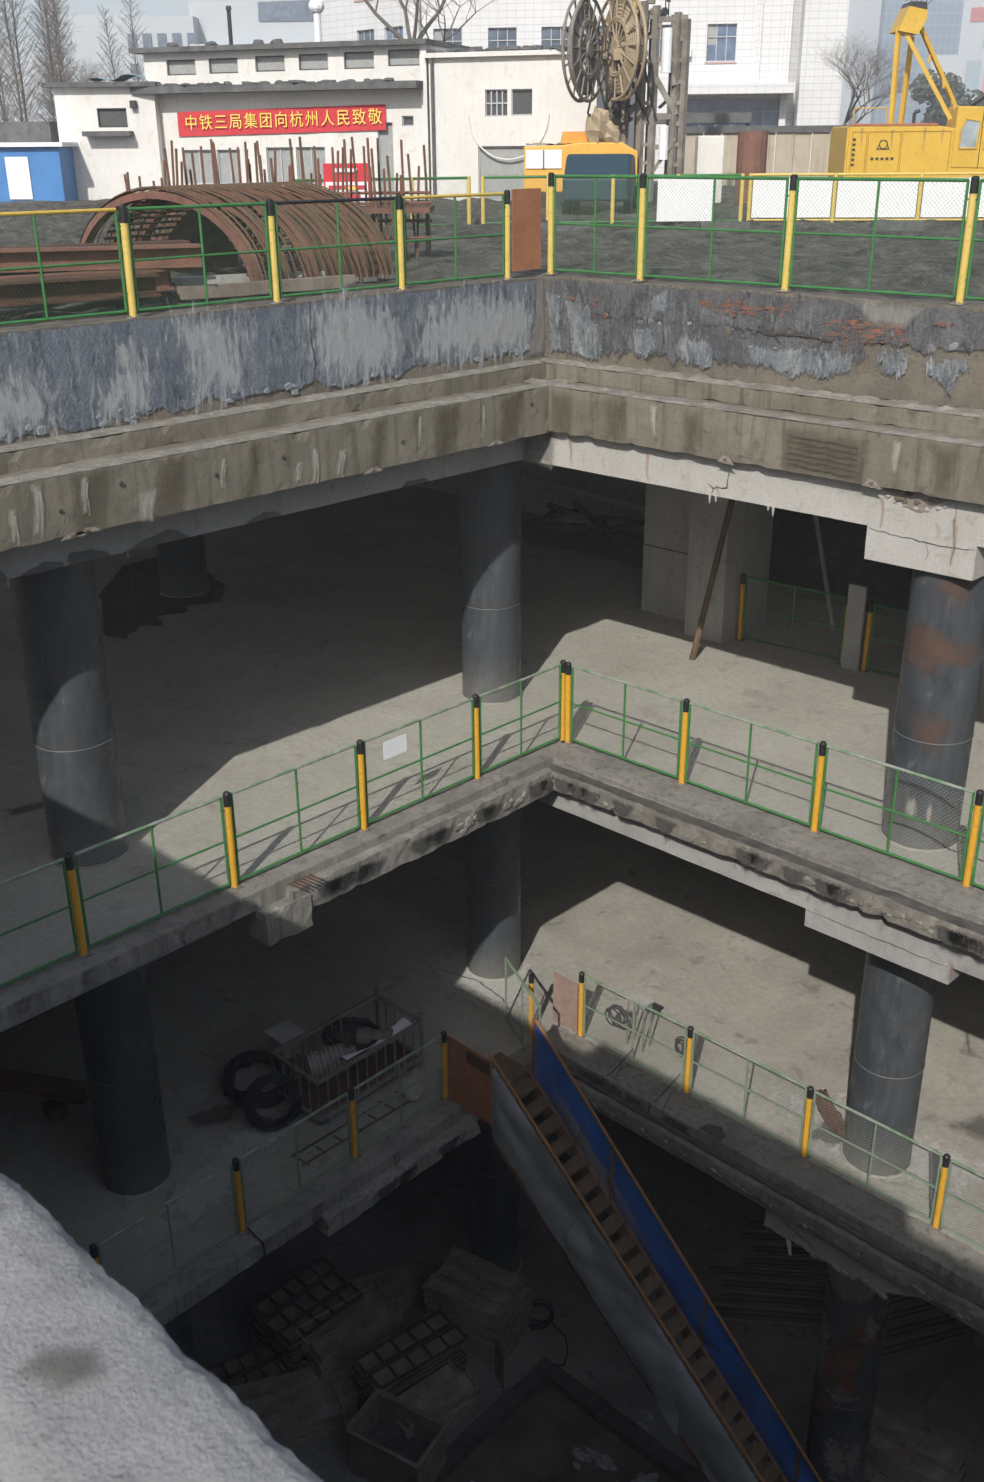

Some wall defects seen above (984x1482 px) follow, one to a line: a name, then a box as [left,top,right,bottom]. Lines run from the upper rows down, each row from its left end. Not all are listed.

efflorescence [0,366,61,442]
efflorescence [98,309,252,427]
water stain [307,287,532,390]
peeling [0,277,984,443]
water stain [503,397,566,465]
spalling [60,527,101,541]
water stain [26,1354,91,1383]